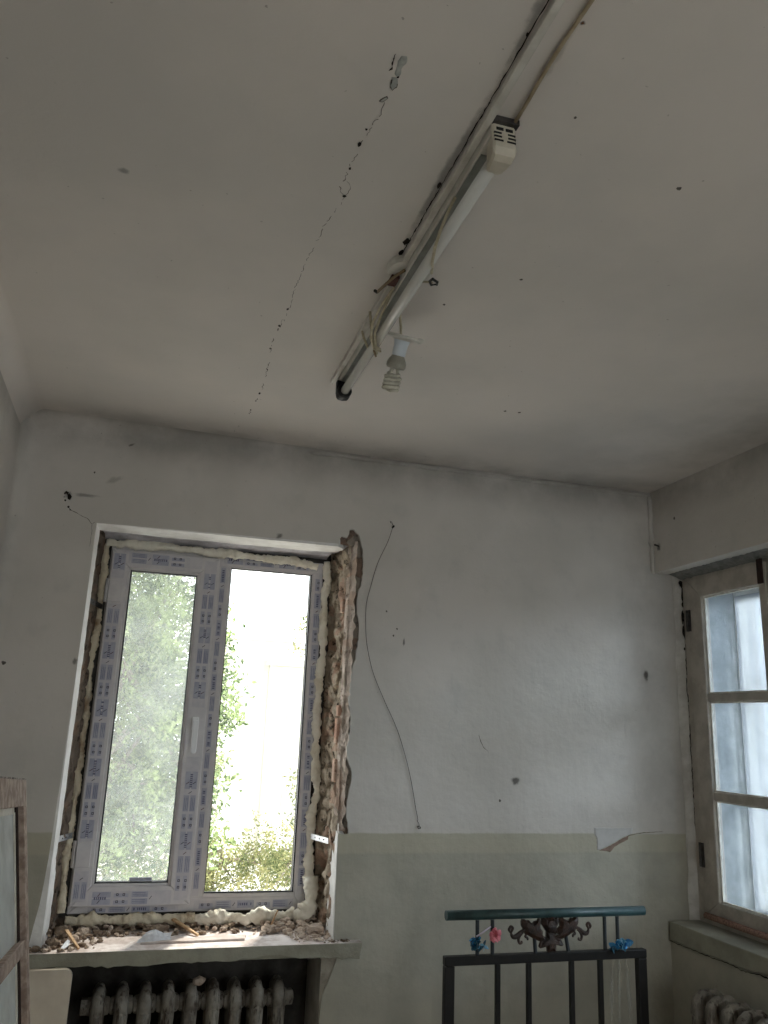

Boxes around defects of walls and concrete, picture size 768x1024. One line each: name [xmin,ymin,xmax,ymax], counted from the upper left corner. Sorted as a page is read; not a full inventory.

flaking render [379,54,407,102]
crack [249,103,385,414]
flaking render [47,491,363,940]
peeling [594,827,654,852]